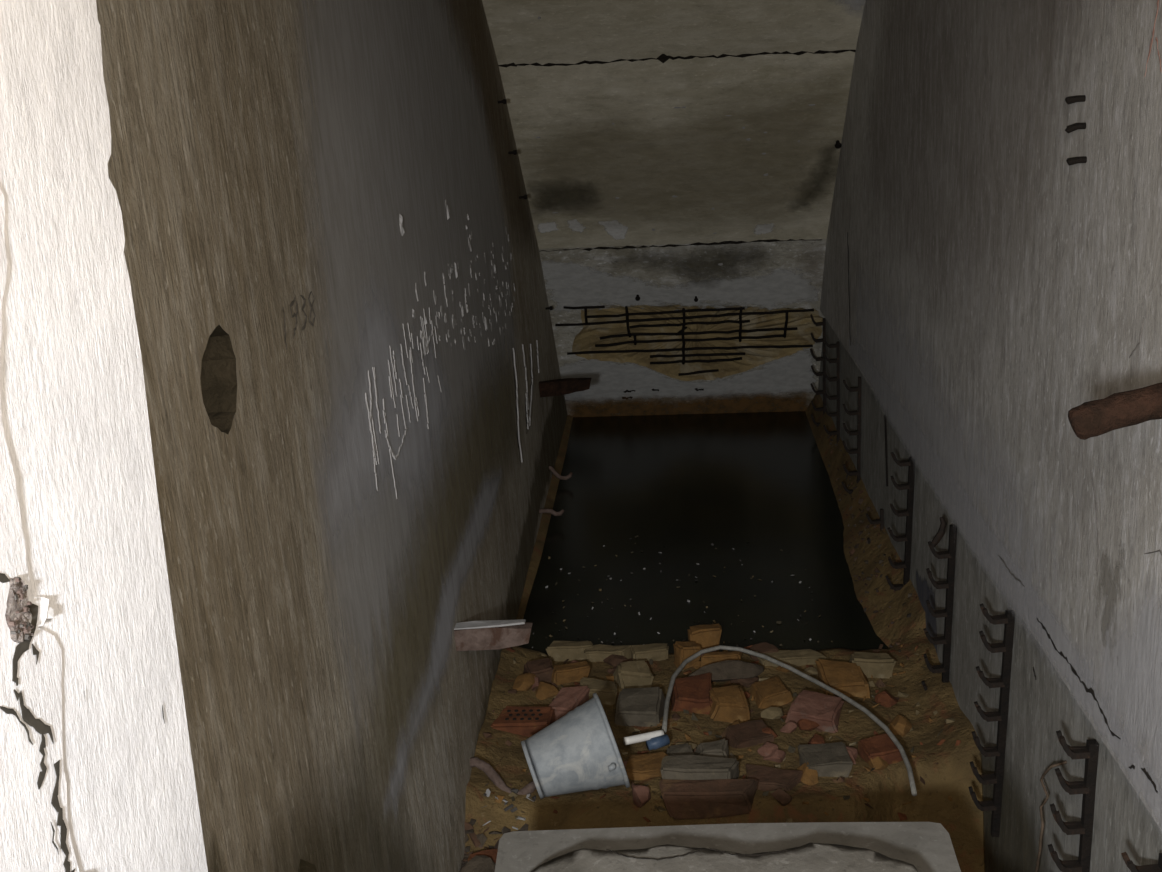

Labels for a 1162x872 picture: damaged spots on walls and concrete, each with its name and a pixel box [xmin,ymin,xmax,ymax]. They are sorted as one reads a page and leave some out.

water stain [303,0,526,794]
crack [0,573,10,583]
crack [0,603,75,872]
peeling [0,397,79,872]
crack [606,848,787,860]
water stain [849,340,1162,825]
crack [998,555,1024,586]
crack [1037,618,1158,792]